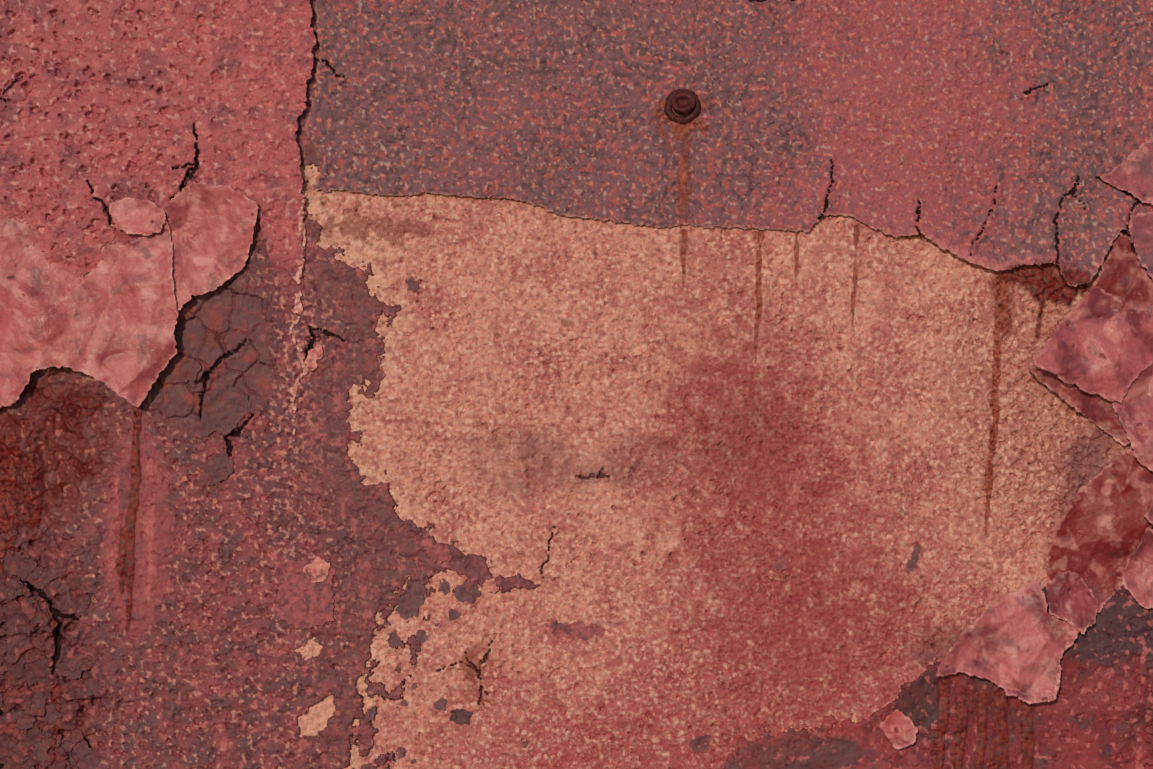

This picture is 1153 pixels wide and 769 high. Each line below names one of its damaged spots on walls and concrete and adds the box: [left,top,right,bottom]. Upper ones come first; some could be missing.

rust [654,89,711,215]
rust [680,229,689,275]
crack [818,159,834,220]
crack [914,200,922,235]
crack [970,185,997,256]
peeling [0,182,259,407]
crack [195,338,247,420]
peeling [200,384,251,436]
crack [224,413,254,456]
spalling [298,136,1153,769]
peeling [274,556,335,660]
rust [933,676,1035,769]